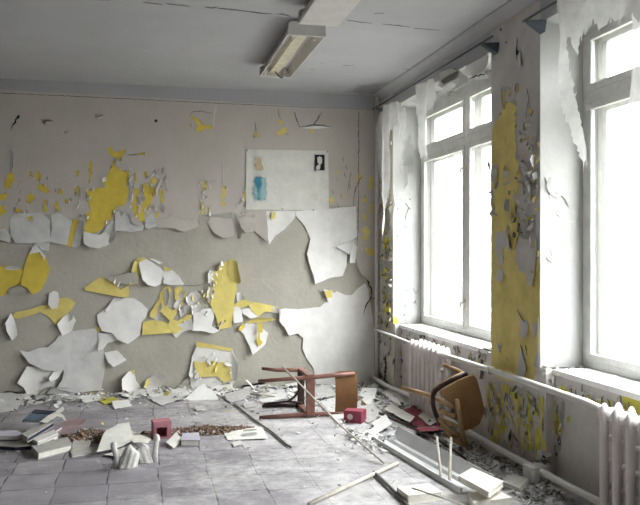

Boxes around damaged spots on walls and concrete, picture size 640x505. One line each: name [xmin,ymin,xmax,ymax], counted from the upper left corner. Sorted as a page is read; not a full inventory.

peeling [436,54,494,103]
crack [0,93,373,246]
peeling [0,83,640,467]